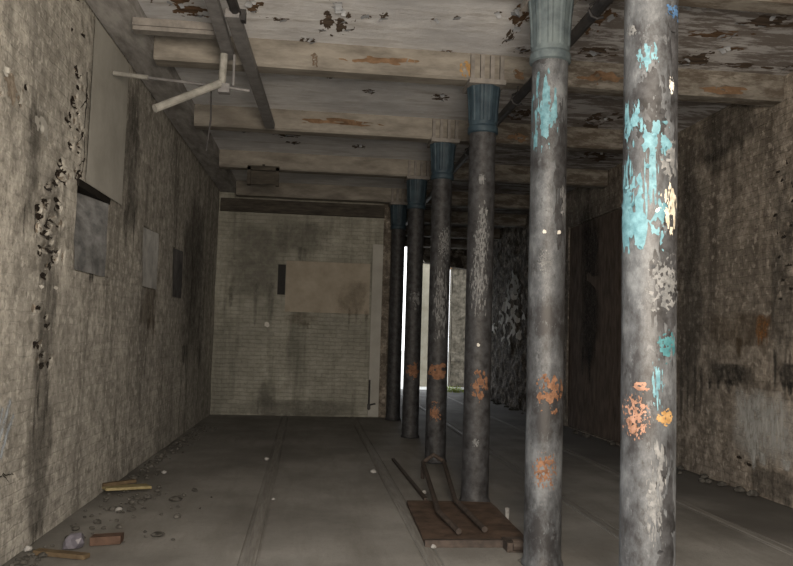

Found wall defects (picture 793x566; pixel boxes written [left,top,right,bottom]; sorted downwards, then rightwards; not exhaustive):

peeling [167,0,209,18]
peeling [299,2,389,67]
peeling [494,3,530,54]
peeling [506,58,614,274]
spalling [34,158,82,289]
peeling [576,1,793,411]
spalling [492,271,525,348]
corrosion [406,362,446,380]
corrosion [470,369,488,403]
corrosion [536,373,563,415]
corrosion [622,382,673,440]
corrosion [532,452,557,490]